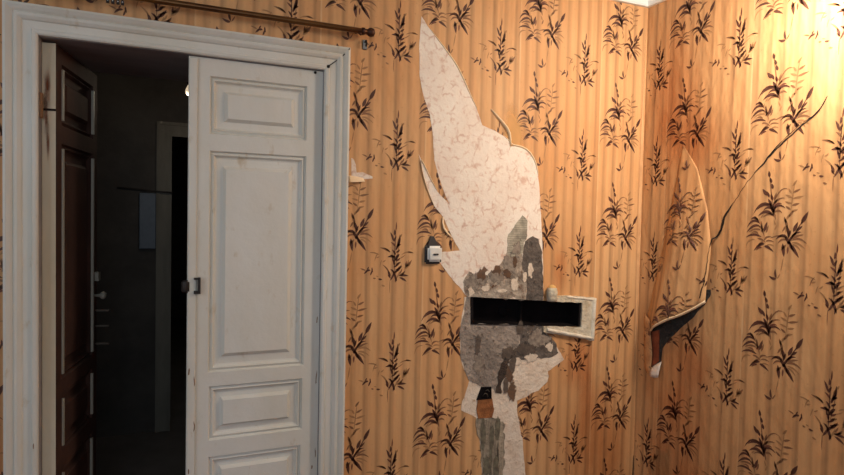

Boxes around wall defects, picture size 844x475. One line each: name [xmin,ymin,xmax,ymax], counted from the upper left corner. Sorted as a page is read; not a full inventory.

crack [699,97,827,298]
spalling [459,236,558,475]
flaking render [652,290,711,367]